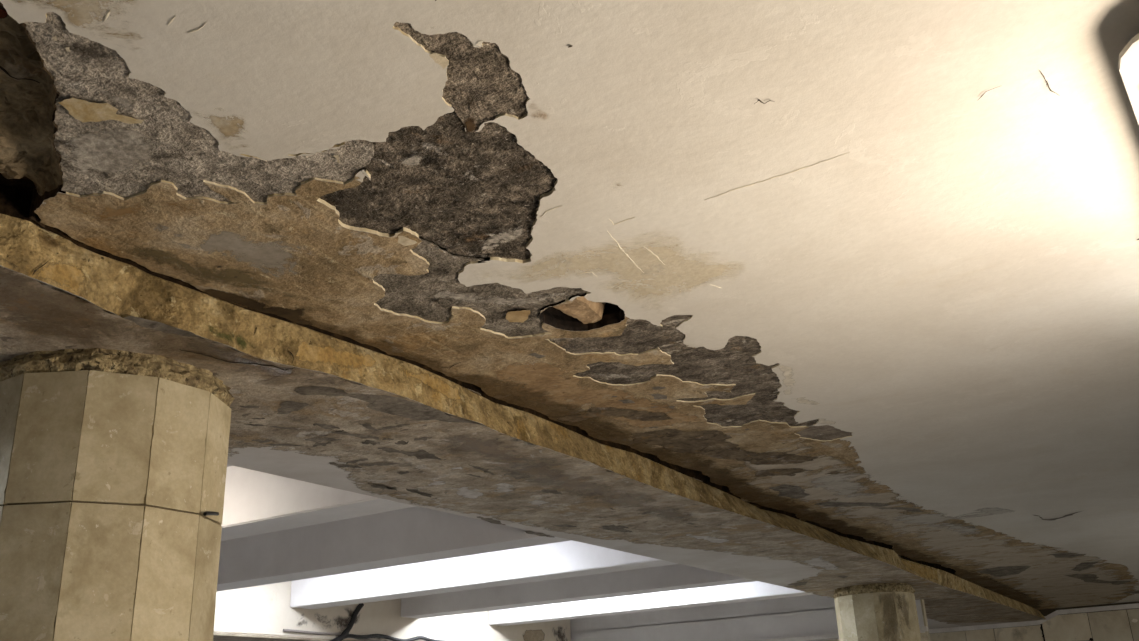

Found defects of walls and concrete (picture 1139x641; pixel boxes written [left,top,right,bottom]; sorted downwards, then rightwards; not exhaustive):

crack [0,173,36,193]
flaking render [0,2,928,513]
crack [179,349,295,371]
crack [442,361,482,396]
crack [690,470,703,481]
peeling [976,566,1031,577]
peeling [1049,553,1139,594]